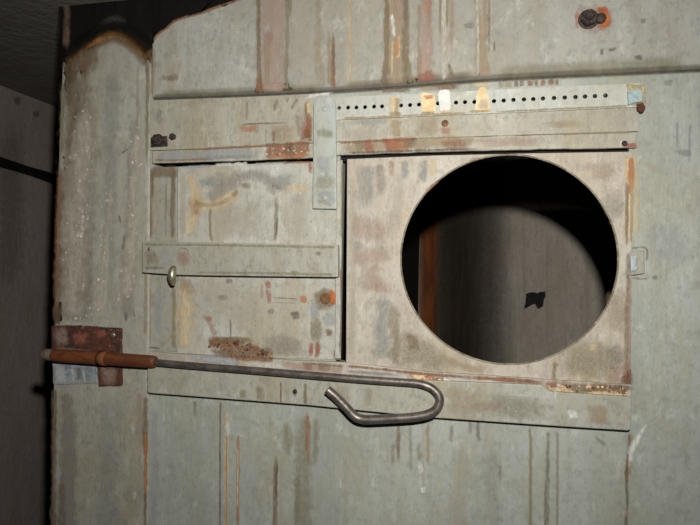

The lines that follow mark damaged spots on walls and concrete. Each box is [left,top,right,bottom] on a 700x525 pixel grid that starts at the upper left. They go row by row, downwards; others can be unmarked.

corrosion [256,0,291,92]
corrosion [598,8,611,27]
corrosion [200,39,335,150]
corrosion [625,157,634,242]
corrosion [286,271,461,377]